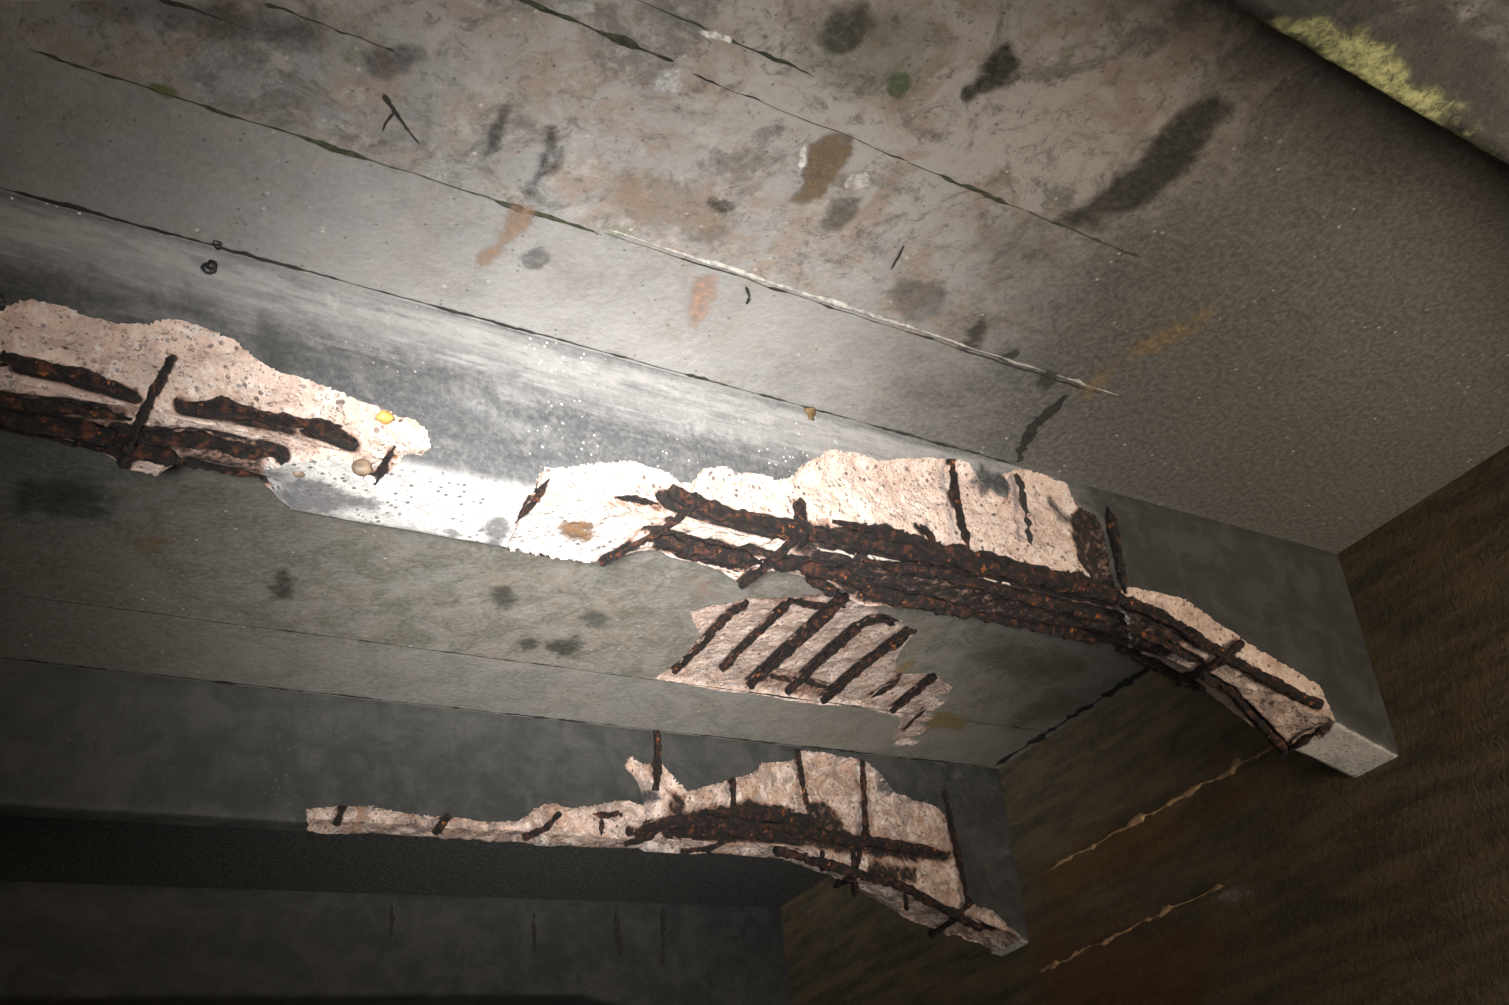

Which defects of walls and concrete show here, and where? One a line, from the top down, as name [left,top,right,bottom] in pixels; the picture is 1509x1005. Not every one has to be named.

spalling [0,299,431,499]
spalling [505,449,1335,757]
spalling [306,730,1020,955]